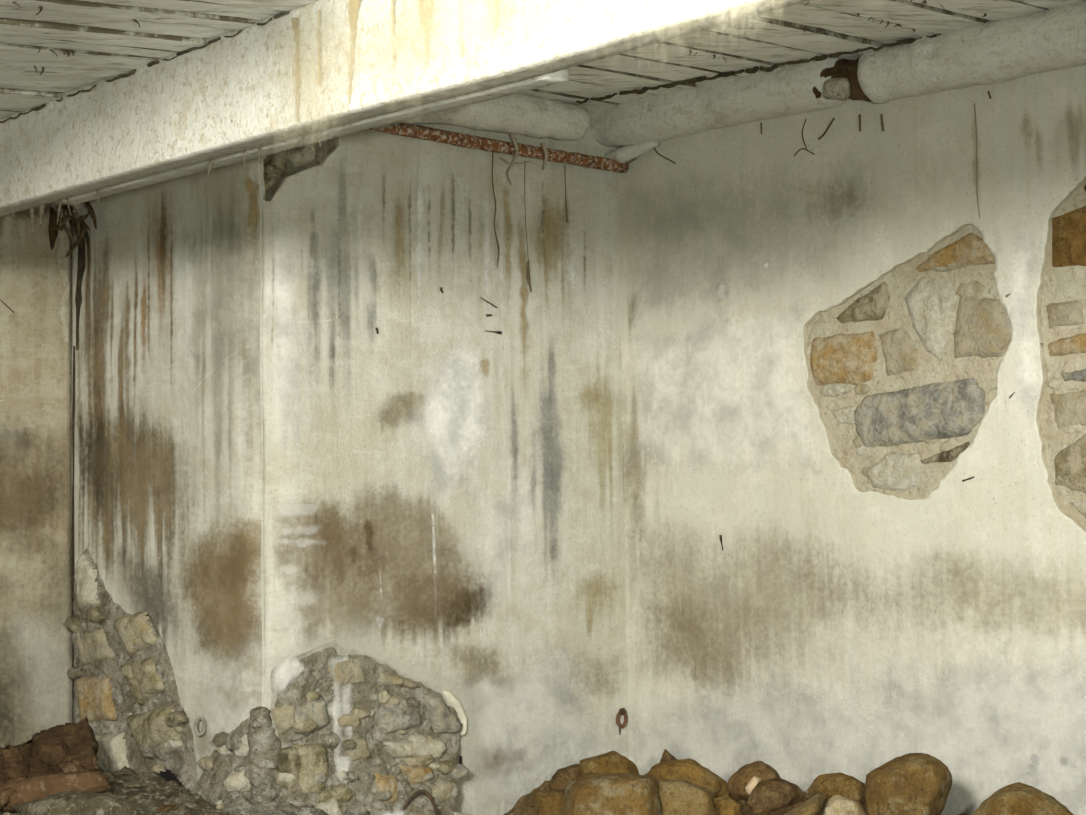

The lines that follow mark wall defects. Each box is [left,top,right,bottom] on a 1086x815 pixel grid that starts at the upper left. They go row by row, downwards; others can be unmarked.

water stain [79,198,189,637]
flaking render [263,138,334,202]
water stain [396,181,471,286]
water stain [383,346,487,493]
water stain [484,191,528,337]
water stain [493,361,561,574]
flaking render [808,225,1013,500]
flaking render [1040,182,1086,528]
water stain [18,625,63,730]
flaking render [64,548,471,815]
water stain [185,497,608,804]